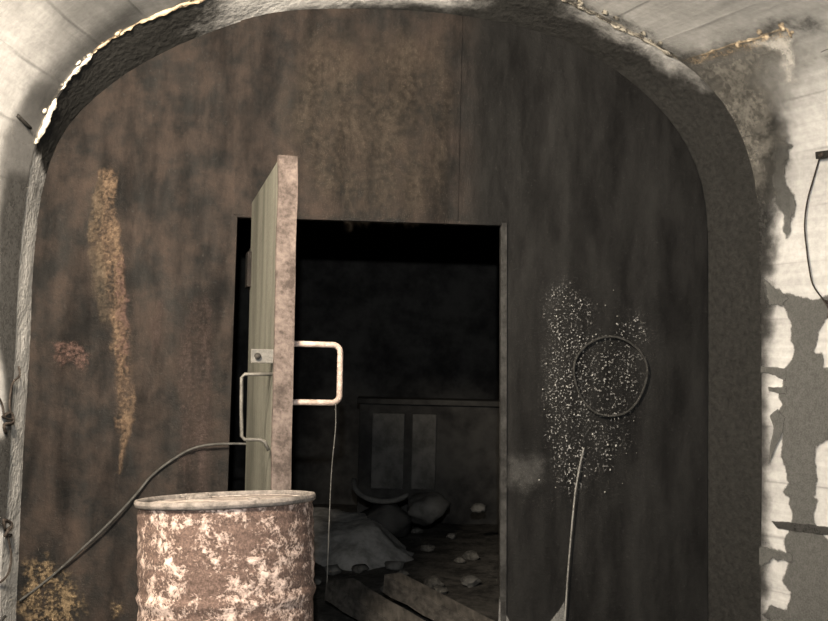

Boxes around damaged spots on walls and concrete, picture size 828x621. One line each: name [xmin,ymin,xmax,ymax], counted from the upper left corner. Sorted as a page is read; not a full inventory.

spalling [35,0,205,144]
spalling [561,0,794,187]
damp [771,137,796,238]
rust [90,171,128,391]
rust [121,396,133,456]
damp [542,288,642,488]
rust [22,562,79,621]